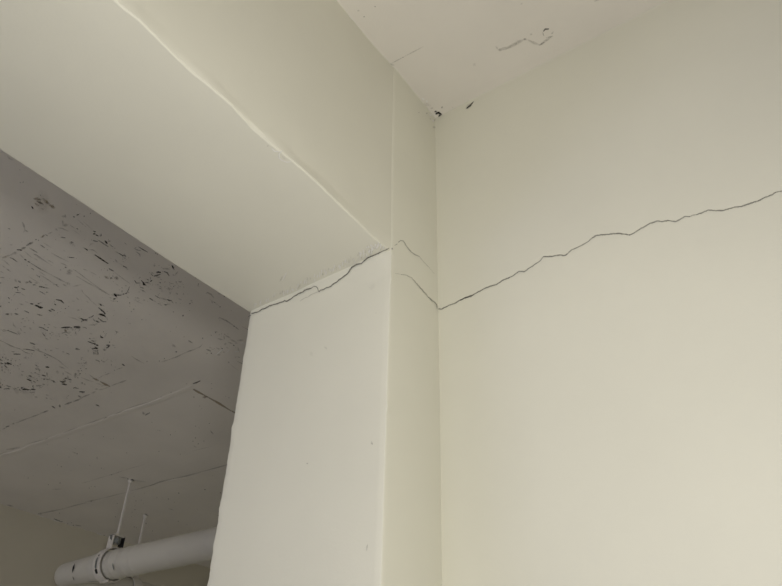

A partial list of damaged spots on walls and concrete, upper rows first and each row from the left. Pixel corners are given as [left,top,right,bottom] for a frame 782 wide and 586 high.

crack [248,248,389,317]